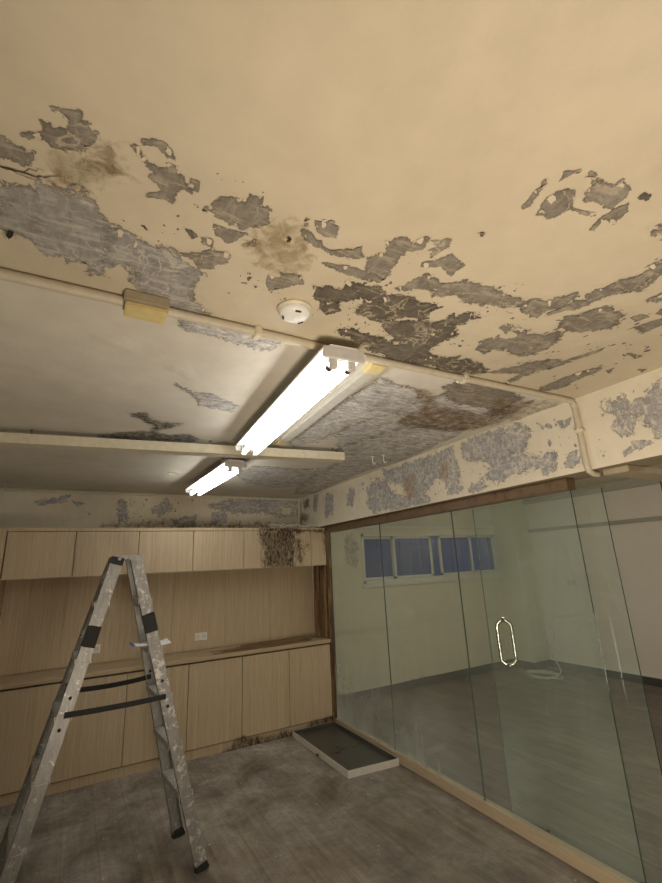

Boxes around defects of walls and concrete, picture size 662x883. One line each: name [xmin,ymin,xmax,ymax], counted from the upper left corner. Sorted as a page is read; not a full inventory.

peeling [0,106,99,168]
peeling [521,169,652,231]
peeling [0,138,281,352]
peeling [174,383,240,413]
peeling [191,217,662,527]
peeling [109,496,198,528]
water stain [104,499,327,568]